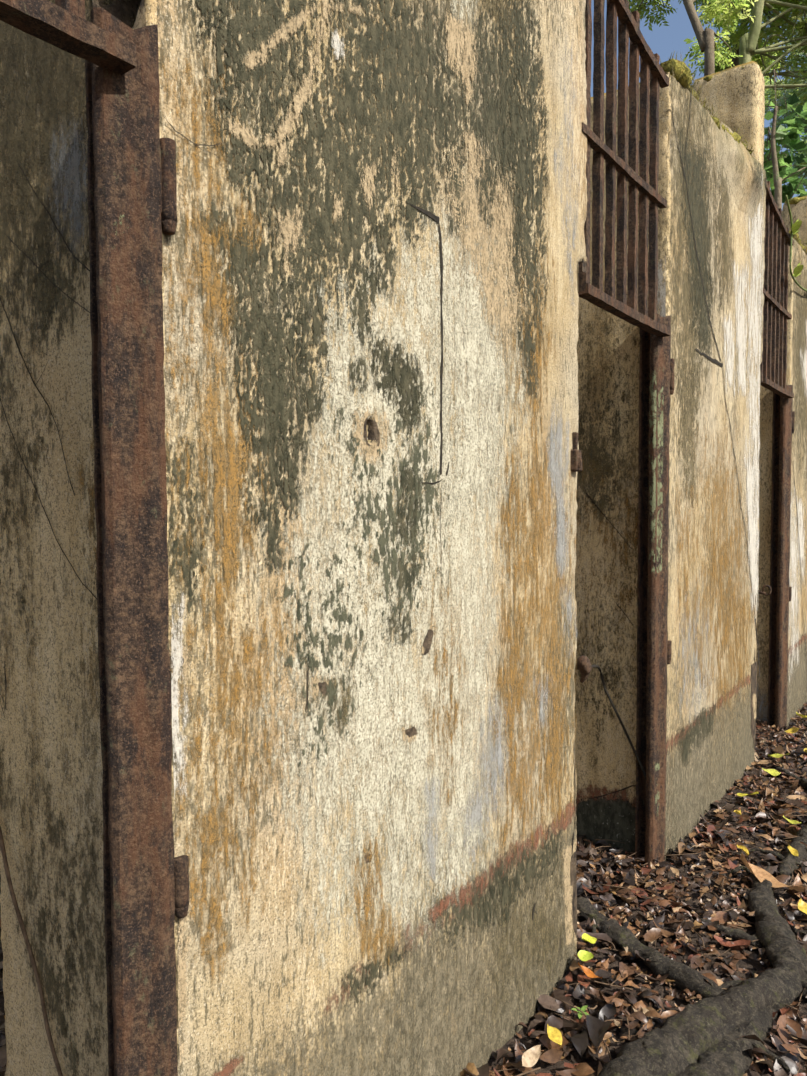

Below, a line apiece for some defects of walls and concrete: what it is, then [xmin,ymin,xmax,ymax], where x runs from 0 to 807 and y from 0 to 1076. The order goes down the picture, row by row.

damp [0,20,90,663]
damp [160,0,638,1020]
damp [675,130,764,767]
mould [0,732,107,1076]